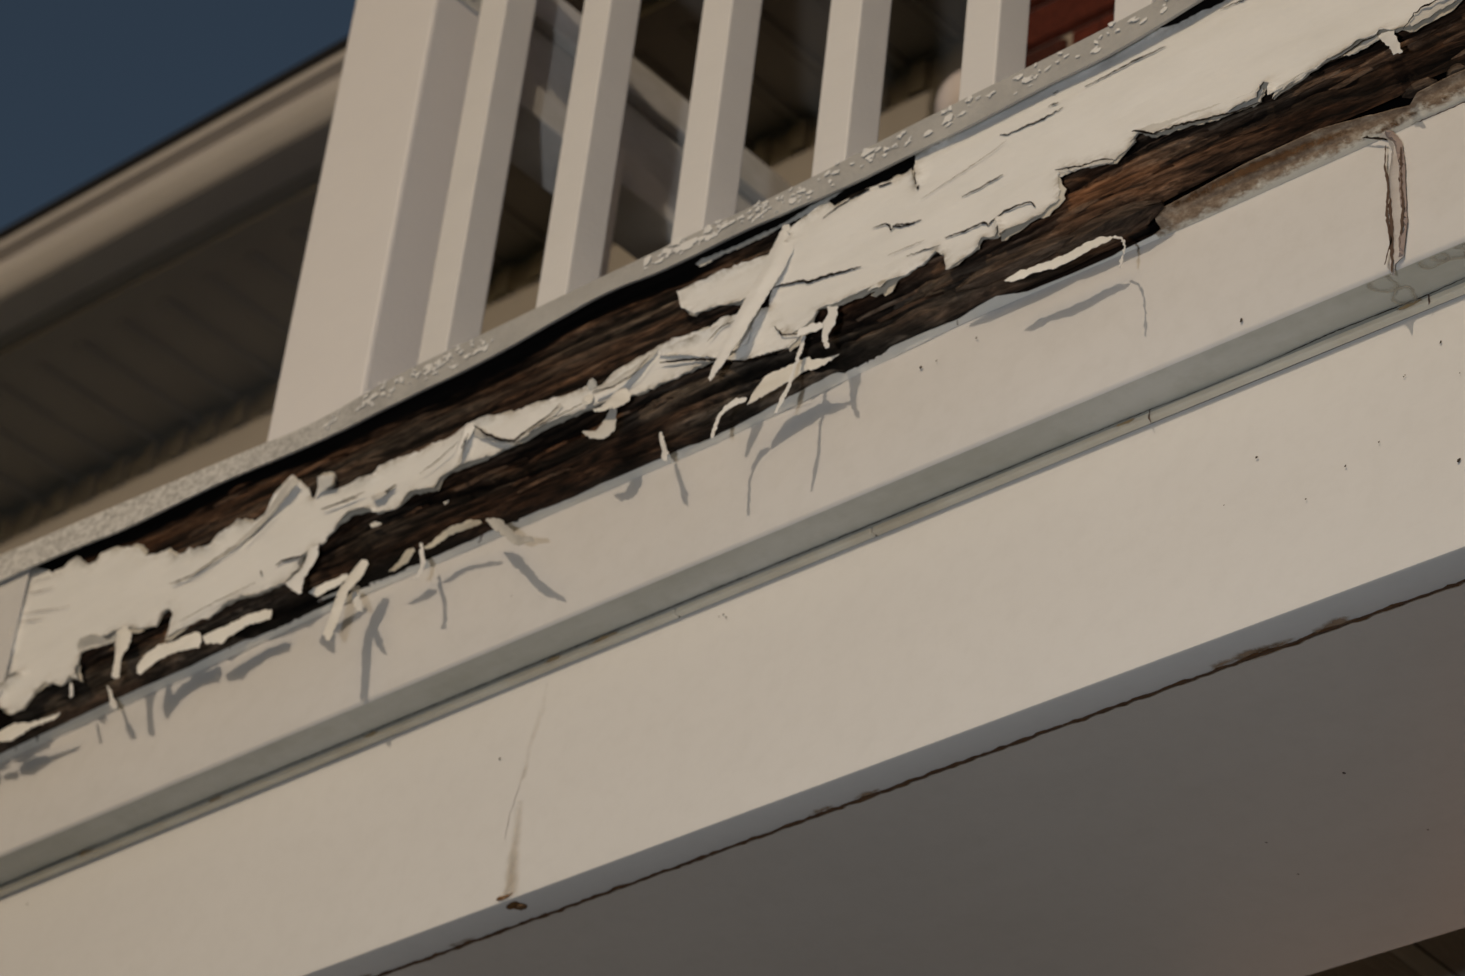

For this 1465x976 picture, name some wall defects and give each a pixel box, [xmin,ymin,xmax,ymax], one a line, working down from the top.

crack [1317,0,1437,68]
crack [1055,102,1259,170]
crack [1363,102,1465,276]
crack [320,46,1166,510]
peeling [0,0,1465,763]
crack [0,278,1464,887]
leakage [496,893,527,910]